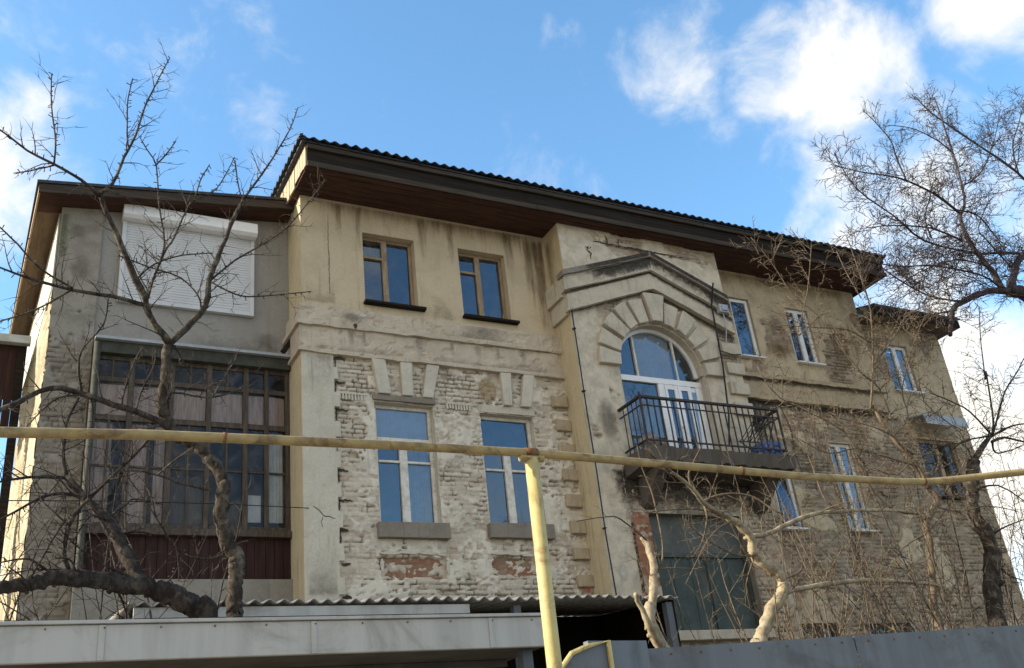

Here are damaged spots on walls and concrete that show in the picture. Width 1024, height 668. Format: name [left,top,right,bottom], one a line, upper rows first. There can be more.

crack [585,235,686,259]
water stain [742,370,871,394]
spalling [379,551,450,580]
spalling [492,551,536,577]